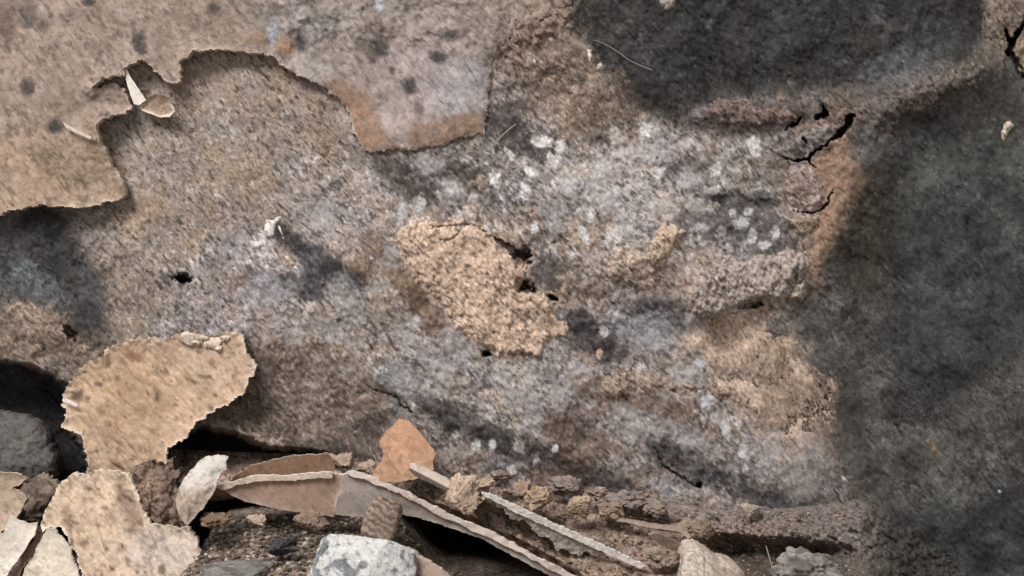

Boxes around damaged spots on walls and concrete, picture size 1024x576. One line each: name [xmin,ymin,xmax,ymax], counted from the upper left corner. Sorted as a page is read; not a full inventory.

peeling [0,0,572,216]
water stain [481,0,984,258]
crack [783,104,856,165]
crack [1004,24,1024,59]
water stain [0,206,109,362]
spalling [387,216,569,359]
water stain [215,55,1024,576]
peeling [0,471,28,532]
peeling [61,330,258,476]
crack [369,386,412,413]
crack [655,448,699,487]